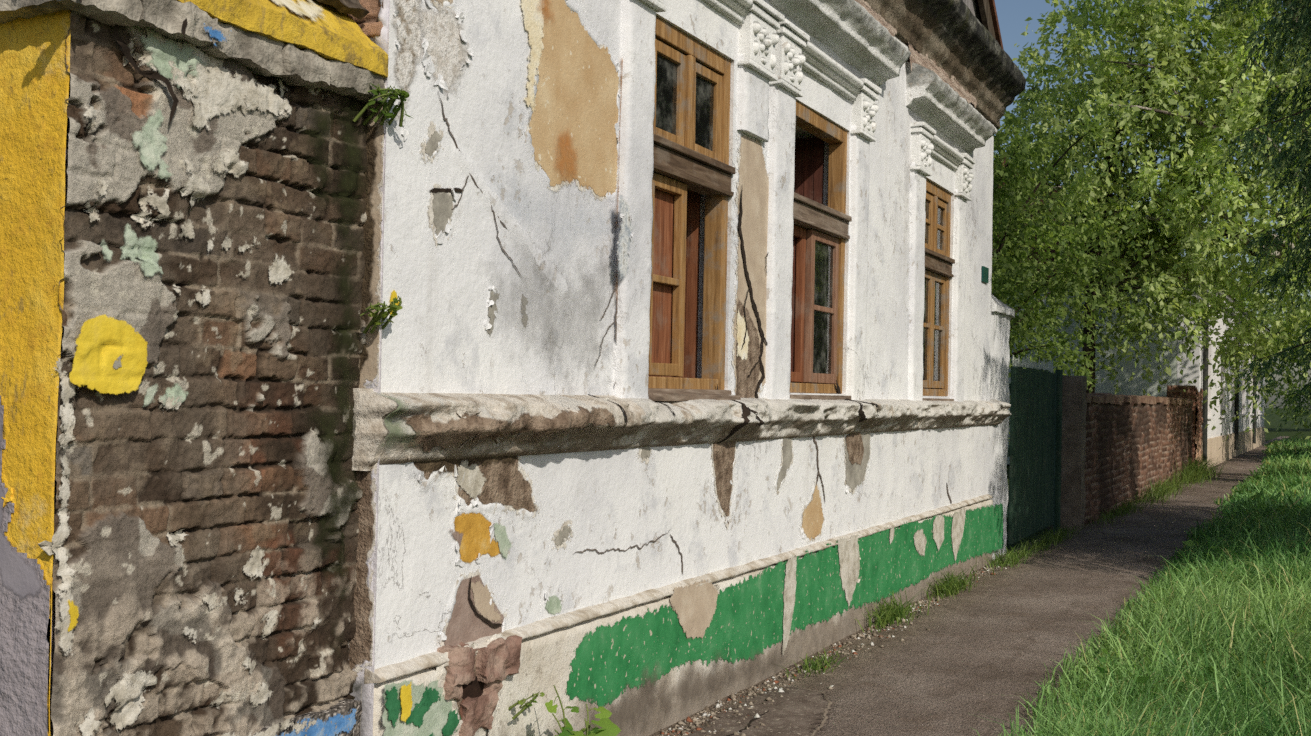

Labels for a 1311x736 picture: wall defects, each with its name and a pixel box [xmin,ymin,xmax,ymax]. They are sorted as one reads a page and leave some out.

flaking render [100,109,260,306]
flaking render [123,23,292,130]
flaking render [347,0,474,388]
flaking render [520,0,635,279]
crack [716,189,768,445]
flaking render [730,131,769,398]
peeling [0,314,188,736]
flaking render [347,463,377,675]
flaking render [382,404,617,736]
crack [575,529,683,574]
crack [726,711,768,736]
crack [788,686,833,736]